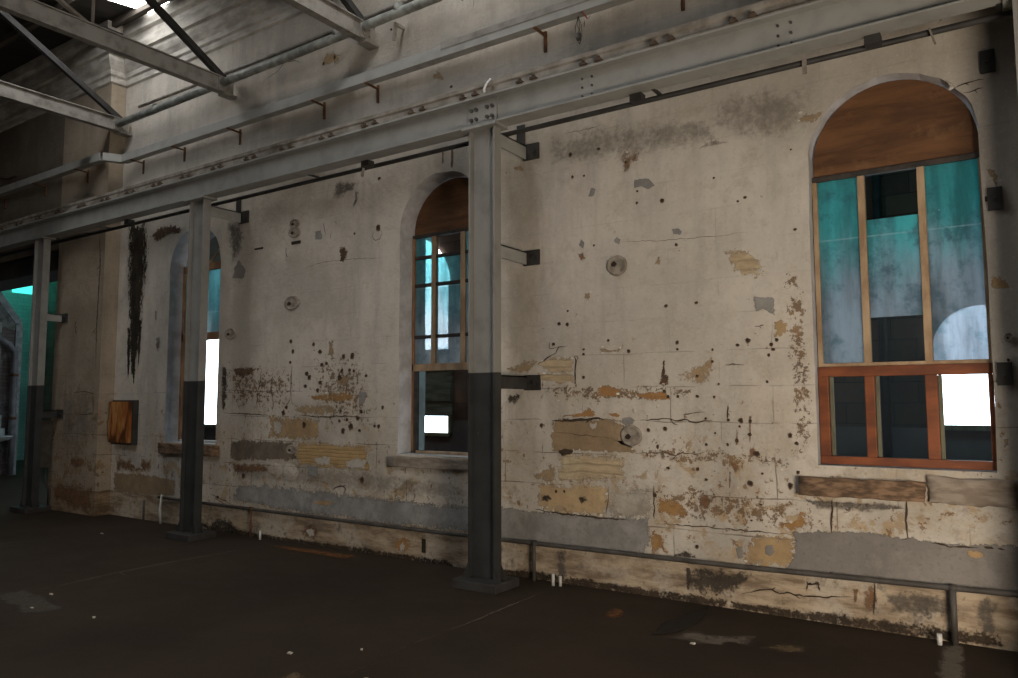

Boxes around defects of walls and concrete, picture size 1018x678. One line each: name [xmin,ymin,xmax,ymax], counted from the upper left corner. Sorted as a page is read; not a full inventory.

leakage [127,223,149,384]
spalling [228,338,377,473]
spalling [507,358,789,516]
peeling [725,248,764,278]
peeling [774,274,812,453]
peeling [649,530,668,555]
spalling [652,481,810,568]